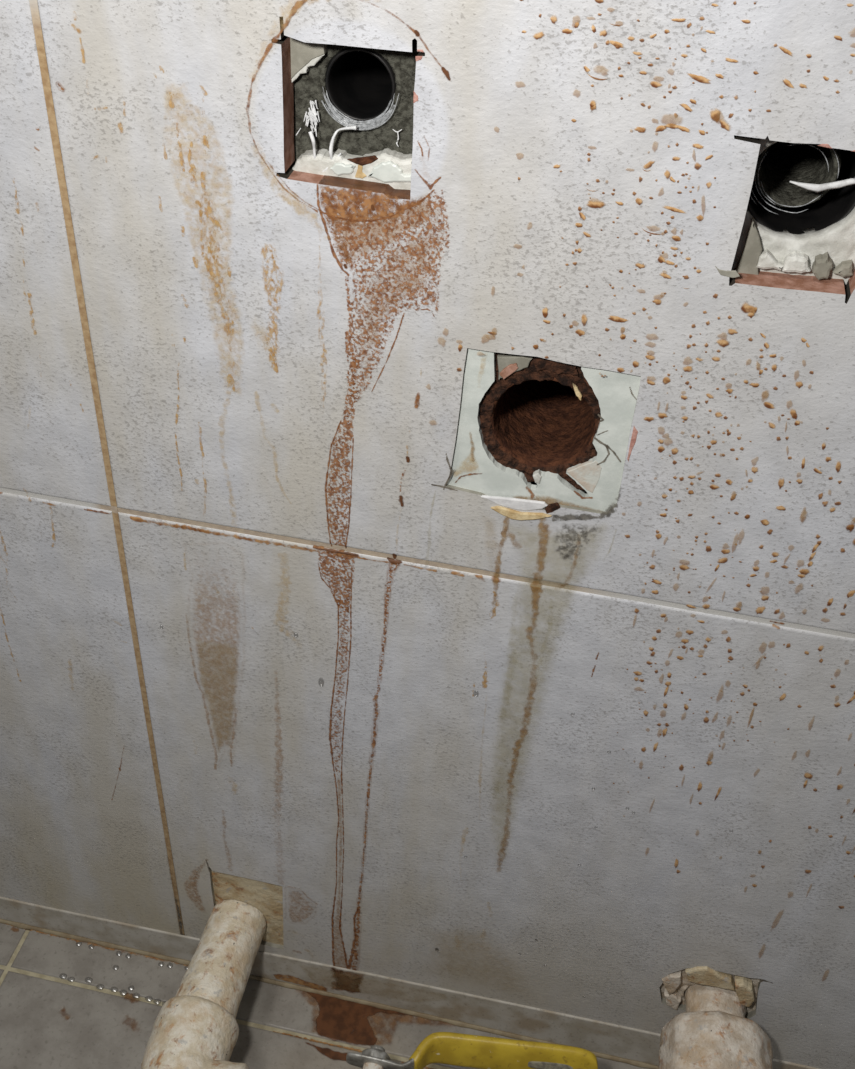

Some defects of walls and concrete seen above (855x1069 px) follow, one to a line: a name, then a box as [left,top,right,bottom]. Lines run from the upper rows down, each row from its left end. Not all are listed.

peeling [497,354,582,400]
spalling [627,426,638,462]
spalling [481,495,561,520]
rust [518,486,592,507]
rust [273,155,449,1061]
spalling [662,966,755,1010]